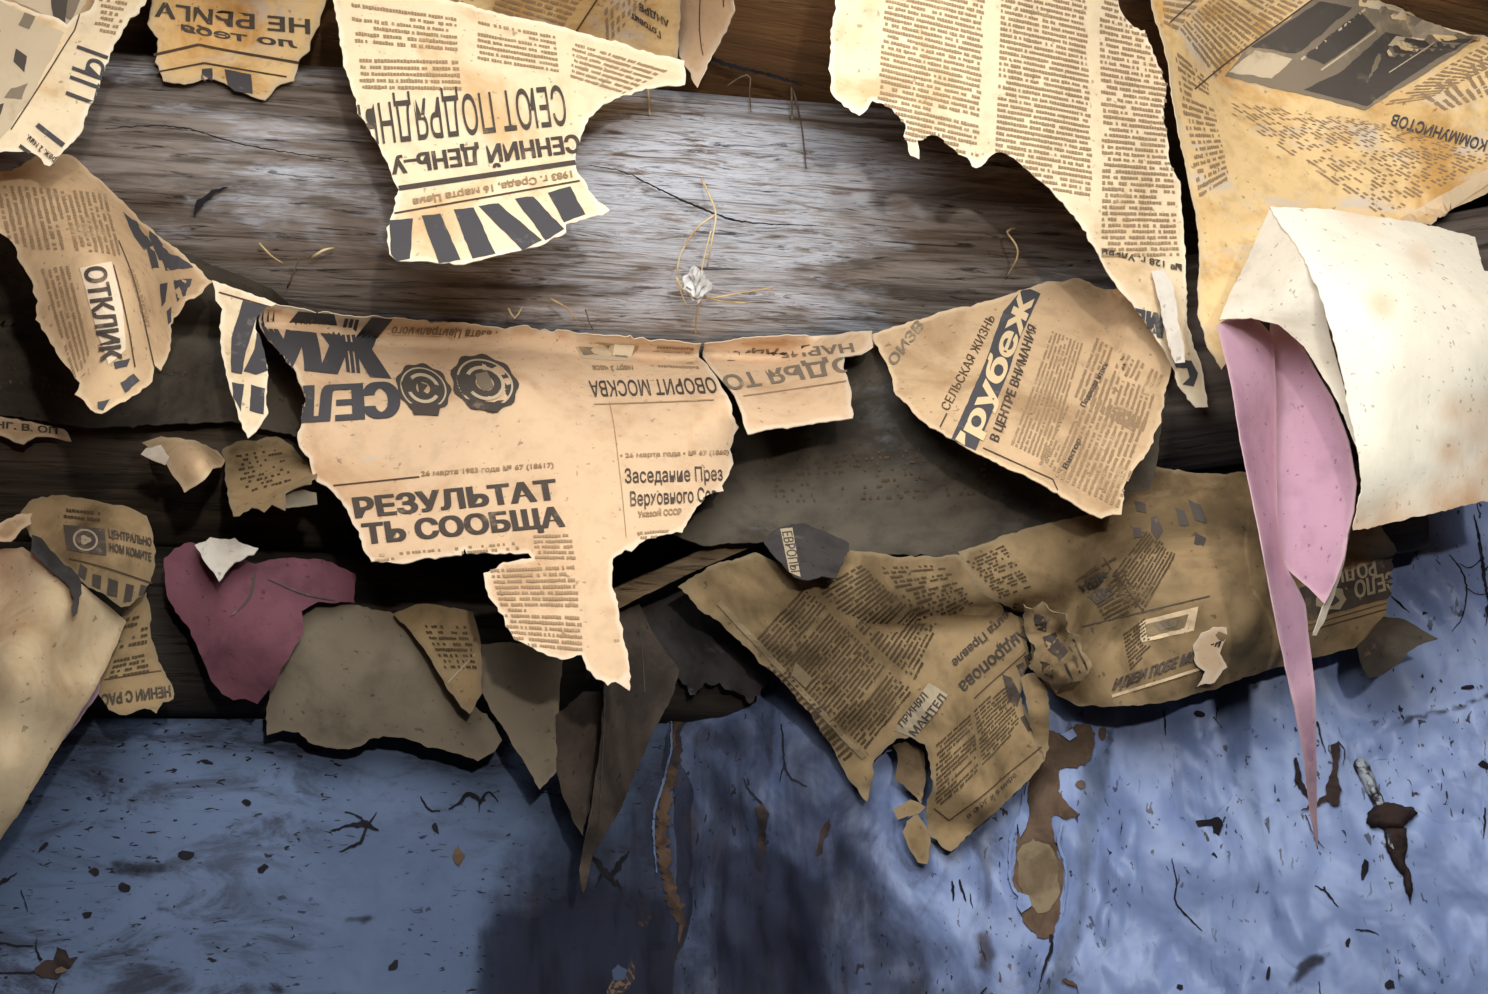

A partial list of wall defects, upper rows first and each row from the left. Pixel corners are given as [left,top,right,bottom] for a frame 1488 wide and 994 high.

peeling [1151,269,1185,363]
flaking render [452,845,465,866]
water stain [481,716,930,994]
flaking render [755,800,769,853]
flaking render [816,819,830,855]
flaking render [1196,817,1223,858]
water stain [980,934,992,967]